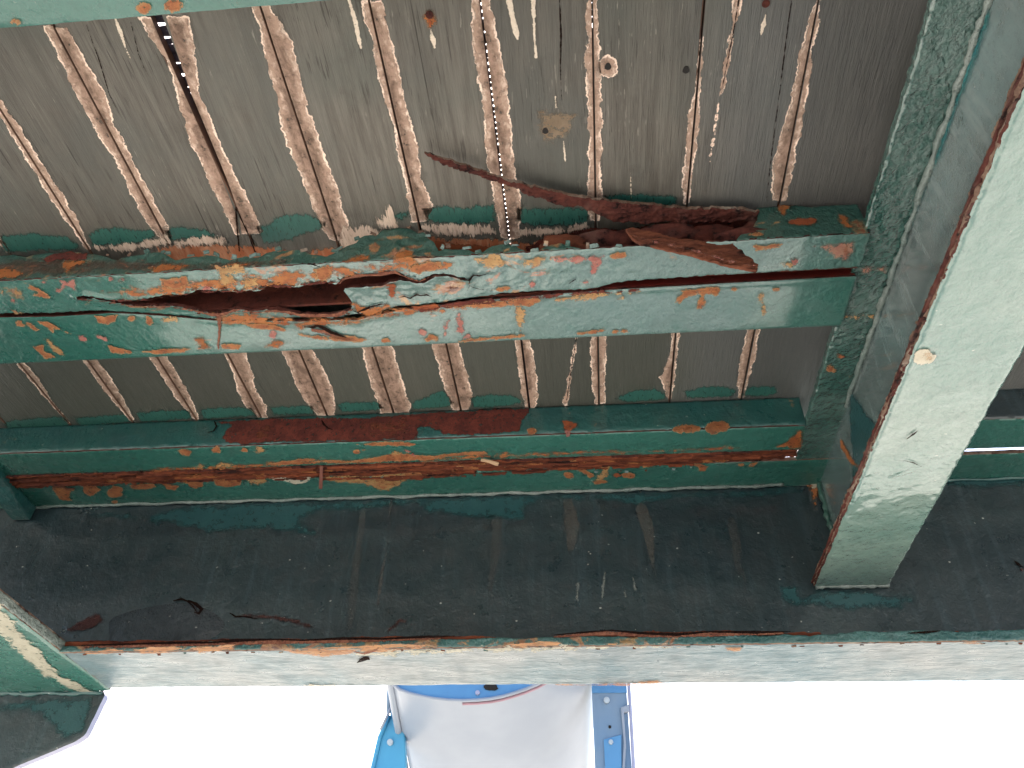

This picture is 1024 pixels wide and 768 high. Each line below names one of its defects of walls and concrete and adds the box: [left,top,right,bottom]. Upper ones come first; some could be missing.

corrosion [778,205,817,225]
crack [304,294,430,341]
corrosion [811,57,1024,586]
corrosion [6,430,802,504]
crack [173,598,203,615]
peeling [0,604,93,692]
crack [553,630,790,638]
crack [909,628,940,636]